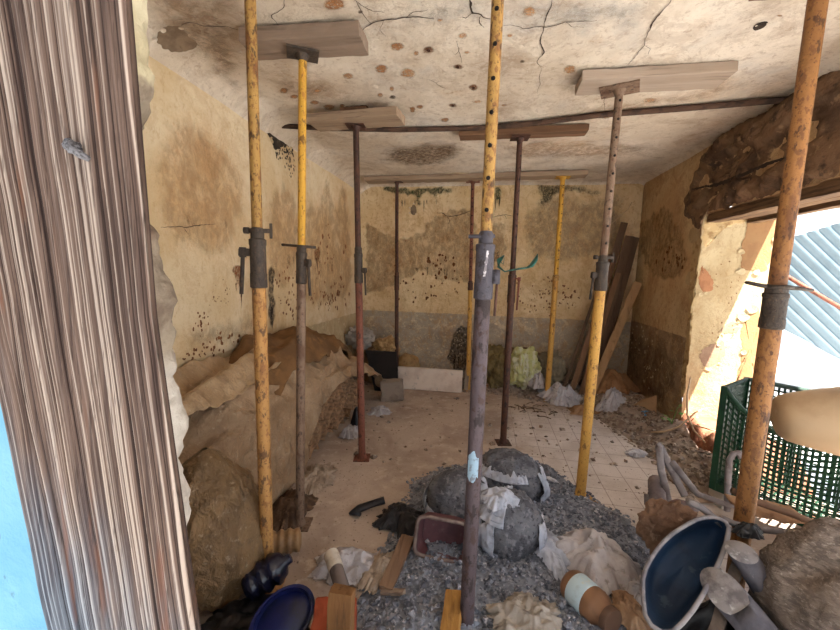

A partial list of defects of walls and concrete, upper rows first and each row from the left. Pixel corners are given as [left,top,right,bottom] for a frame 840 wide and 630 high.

flaking render [151,26,197,60]
crack [355,0,433,30]
crack [463,0,597,88]
crack [633,1,671,59]
flaking render [267,133,293,150]
water stain [388,145,455,164]
peeling [802,70,840,187]
water stain [384,186,451,206]
water stain [539,185,596,203]
peeling [681,92,794,398]